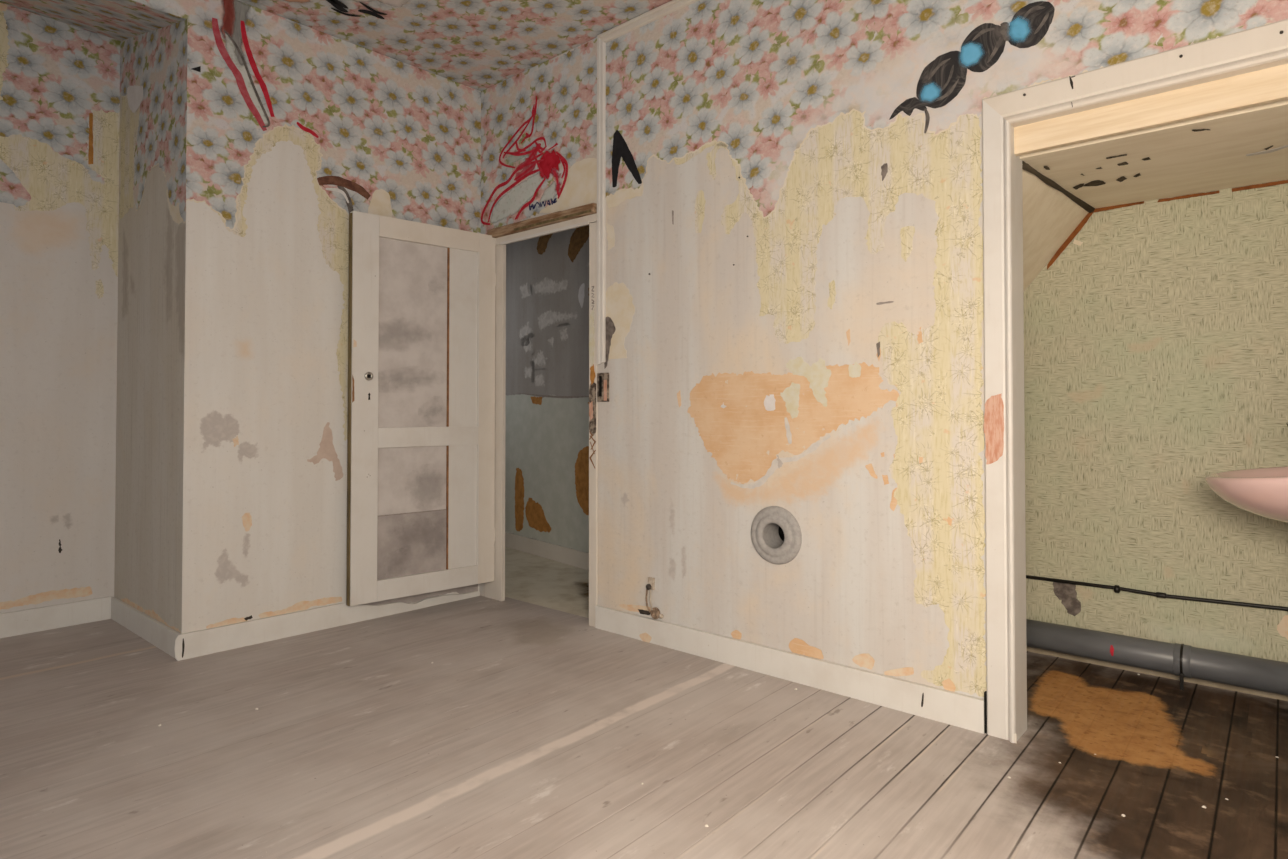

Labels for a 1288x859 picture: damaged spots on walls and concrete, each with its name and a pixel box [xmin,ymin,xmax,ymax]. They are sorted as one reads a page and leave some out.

flaking render [677,342,899,518]
peeling [984,393,1004,464]
flaking render [0,586,92,610]
flaking render [619,604,651,615]
flaking render [789,638,824,659]
water stain [897,651,1288,859]